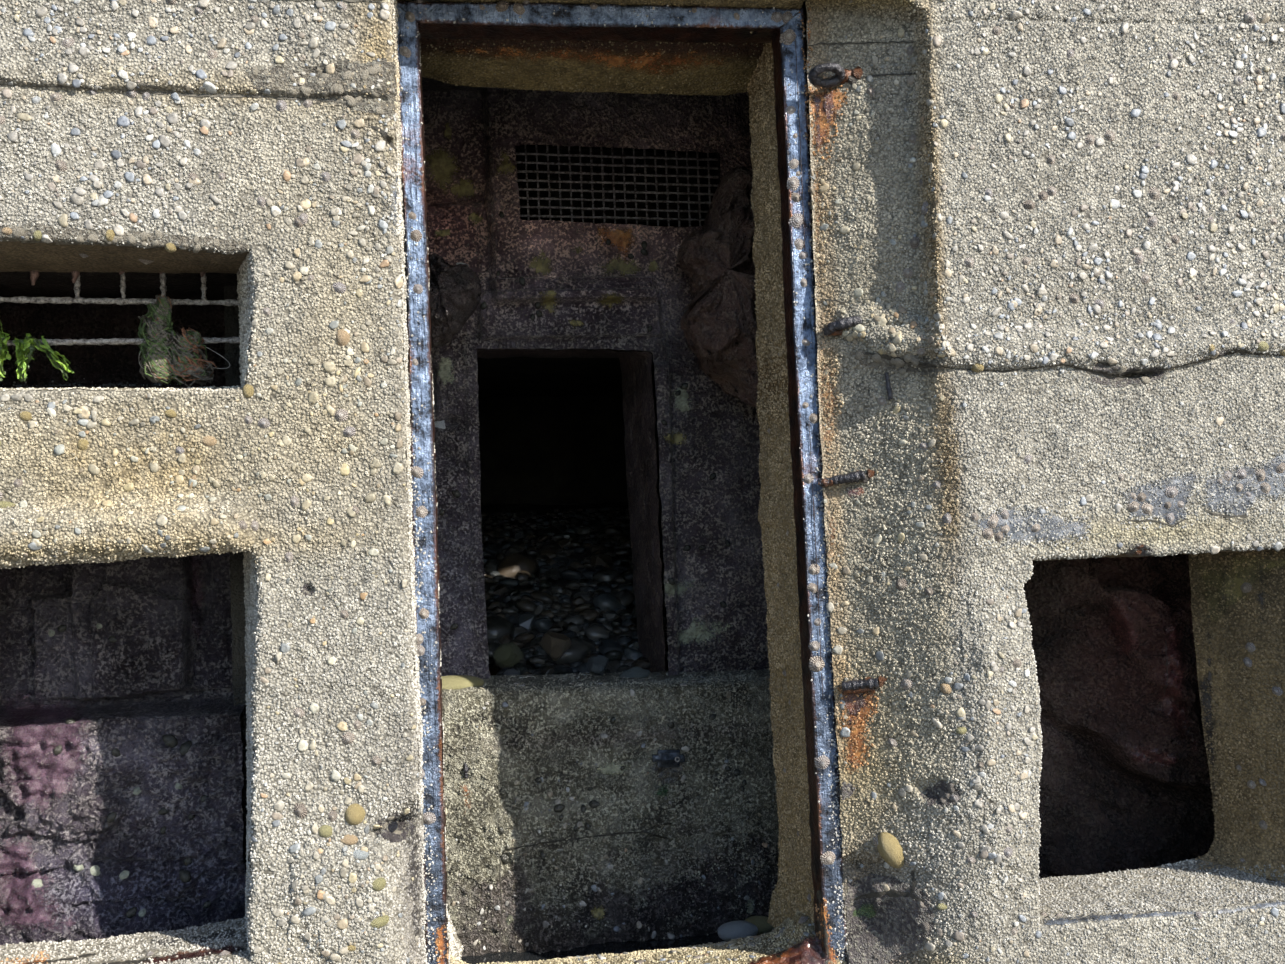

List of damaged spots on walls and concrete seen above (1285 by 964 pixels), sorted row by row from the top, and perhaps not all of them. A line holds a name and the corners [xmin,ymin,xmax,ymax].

rust [810,66,863,156]
crack [865,348,1280,381]
rust [842,675,887,768]
rust [750,899,836,964]